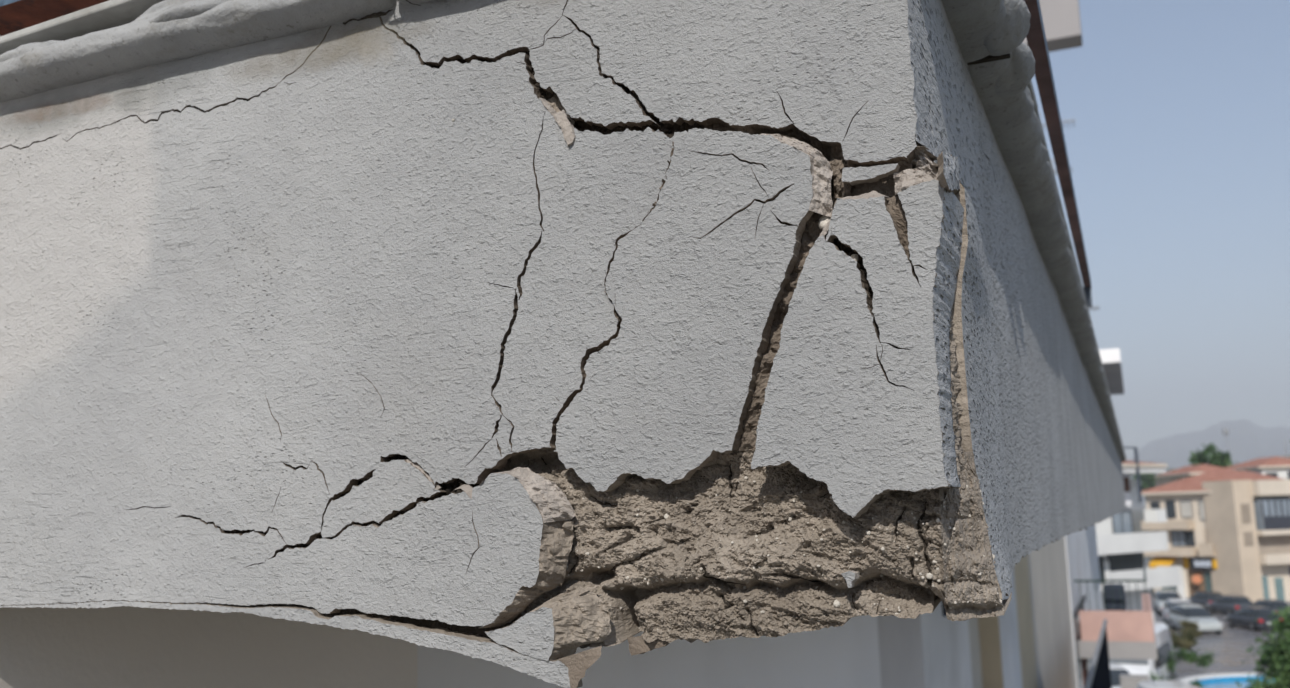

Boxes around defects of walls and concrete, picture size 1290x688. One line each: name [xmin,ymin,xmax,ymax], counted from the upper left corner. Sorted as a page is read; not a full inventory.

crack [343,0,926,451]
crack [949,310,965,478]
crack [127,454,480,567]
crack [250,604,512,638]
spalling [0,428,1012,688]